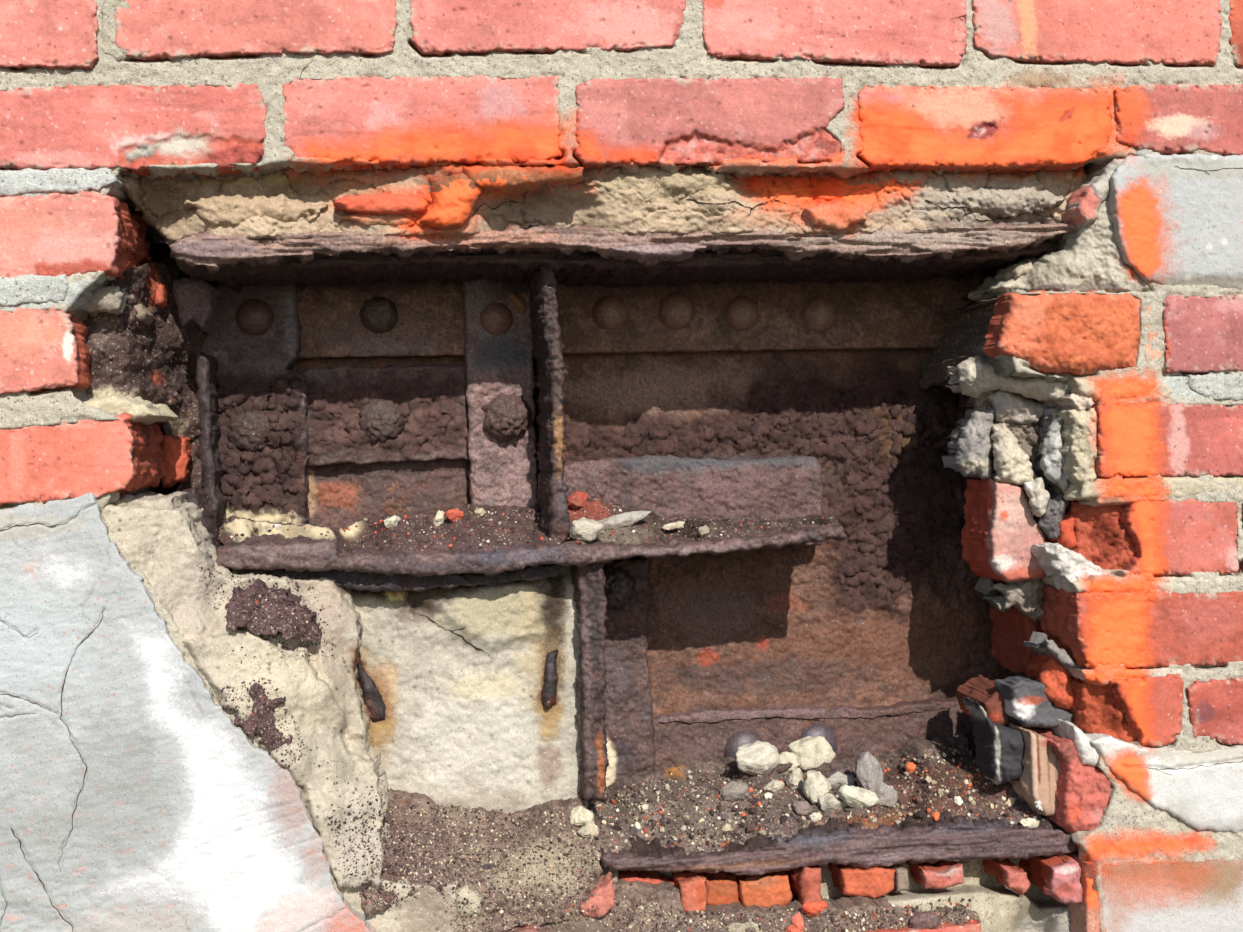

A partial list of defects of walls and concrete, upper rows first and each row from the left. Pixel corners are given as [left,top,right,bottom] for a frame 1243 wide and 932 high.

corrosion [172,277,221,334]
spalling [122,128,1150,373]
crack [0,503,96,532]
crack [0,608,105,932]
flaking render [102,502,458,932]
corrosion [181,350,465,550]
corrosion [351,649,393,750]
corrosion [339,585,477,613]
corrosion [516,578,567,738]
corrosion [564,358,964,616]
spalling [1014,679,1138,833]
spalling [1069,501,1140,570]